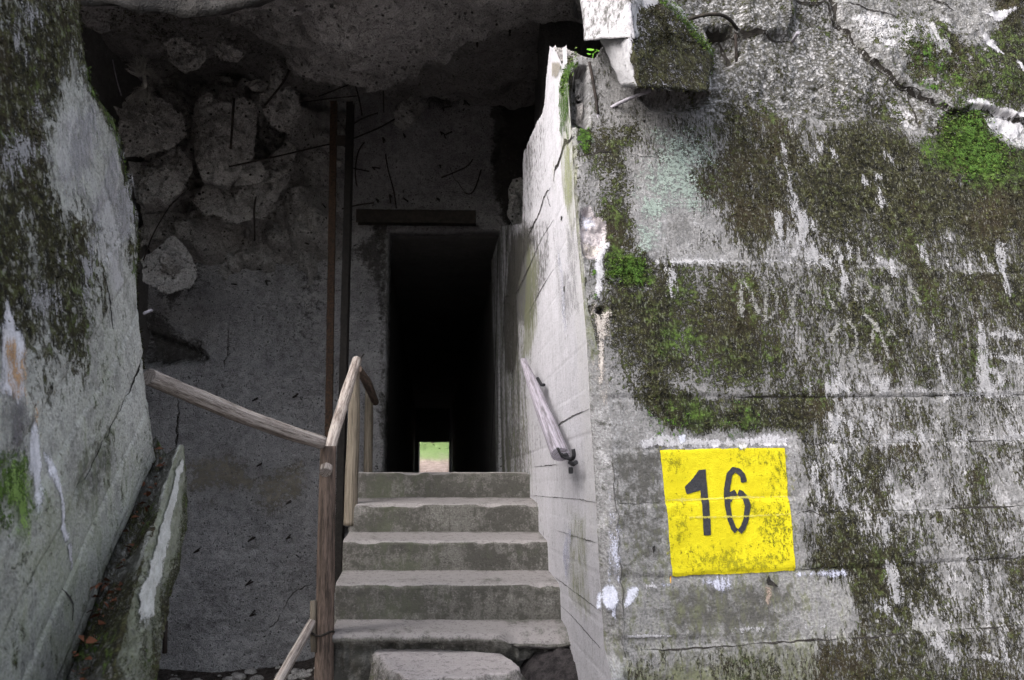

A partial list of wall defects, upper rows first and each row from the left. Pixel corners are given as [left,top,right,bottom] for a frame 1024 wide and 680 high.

crack [706,24,785,67]
crack [796,0,1024,131]
damp [968,98,1024,142]
damp [749,121,898,298]
damp [917,235,1012,296]
rust [7,337,38,422]
damp [803,321,1023,403]
damp [0,301,73,568]
damp [639,433,788,450]
damp [806,411,926,511]
damp [596,532,670,618]
damp [874,514,904,626]